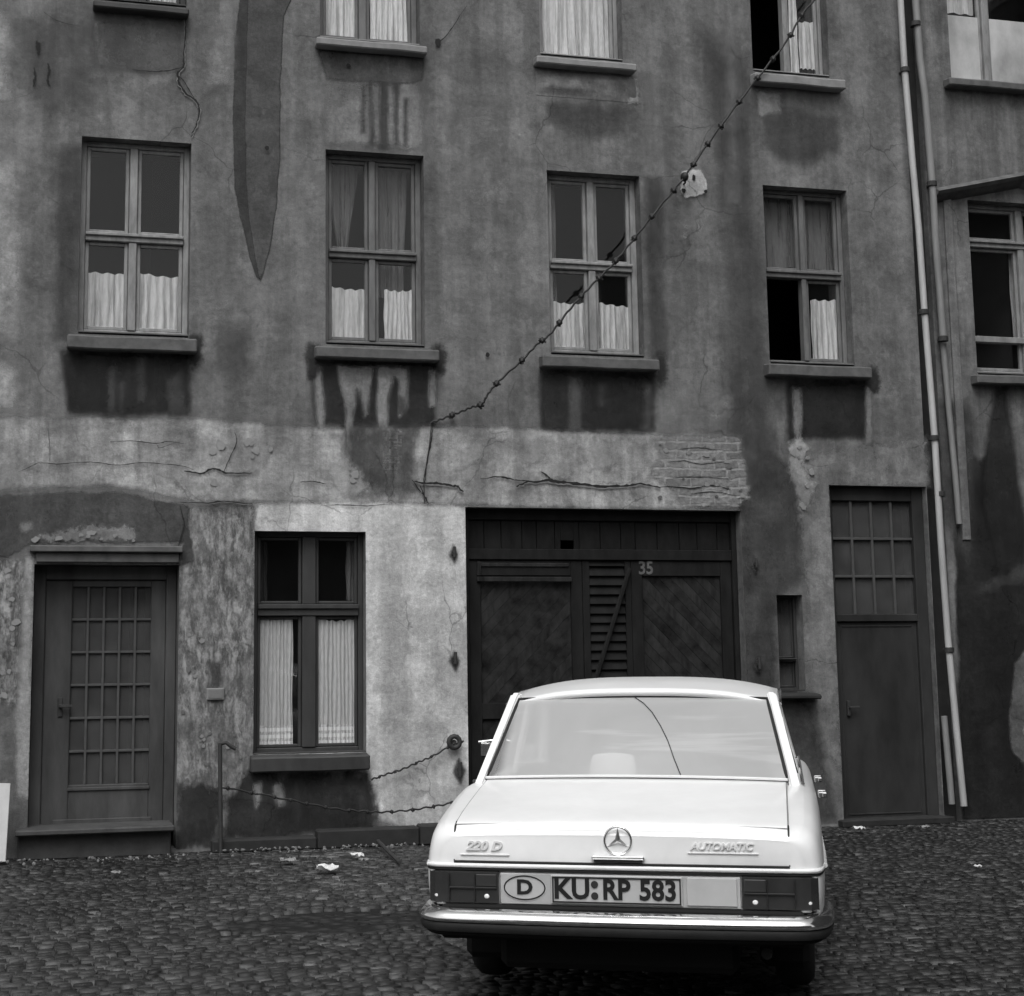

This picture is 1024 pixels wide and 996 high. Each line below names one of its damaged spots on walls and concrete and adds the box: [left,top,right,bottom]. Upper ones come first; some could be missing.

crack [132,19,201,138]
water stain [233,0,291,281]
water stain [62,351,189,416]
crack [21,431,252,475]
water stain [314,361,436,493]
crack [412,426,731,504]
water stain [540,370,655,431]
flaking render [651,435,750,507]
flaking render [788,437,817,516]
water stain [787,381,872,444]
flaking render [31,524,136,543]
water stain [944,388,1024,819]